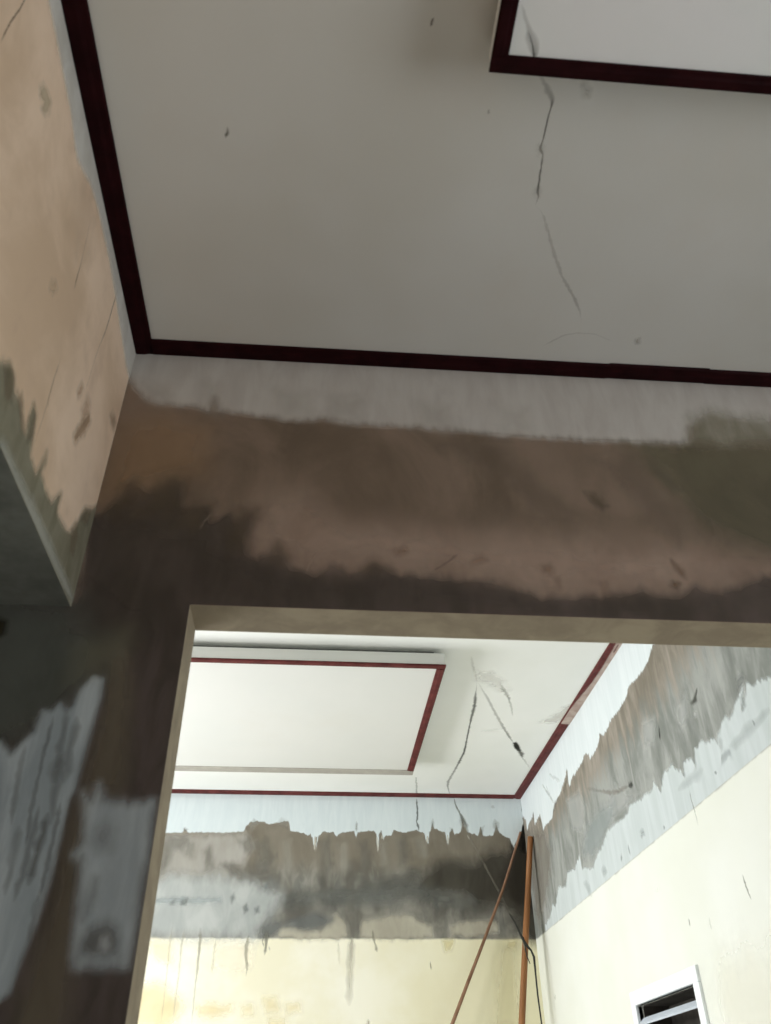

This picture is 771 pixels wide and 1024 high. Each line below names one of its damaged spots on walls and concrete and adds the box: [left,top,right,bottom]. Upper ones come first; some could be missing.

crack [529,38,537,58]
crack [537,99,553,197]
leakage [0,420,771,1024]
crack [447,674,524,832]